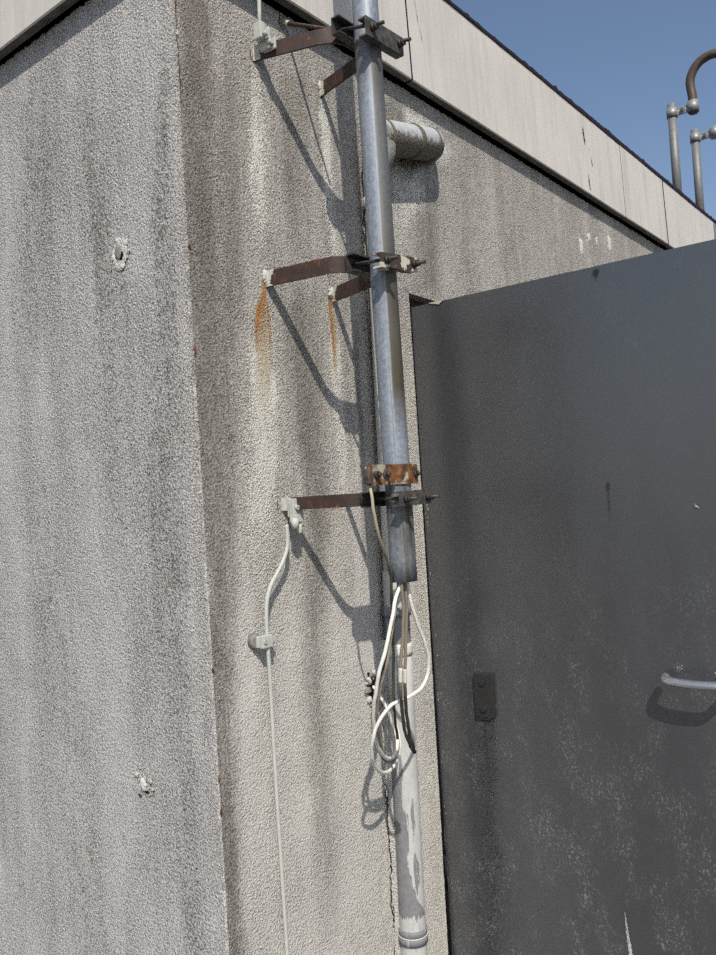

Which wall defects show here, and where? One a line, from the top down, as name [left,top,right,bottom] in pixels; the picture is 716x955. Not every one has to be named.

corrosion [253,281,273,402]
corrosion [329,298,337,367]
crack [385,777,396,955]